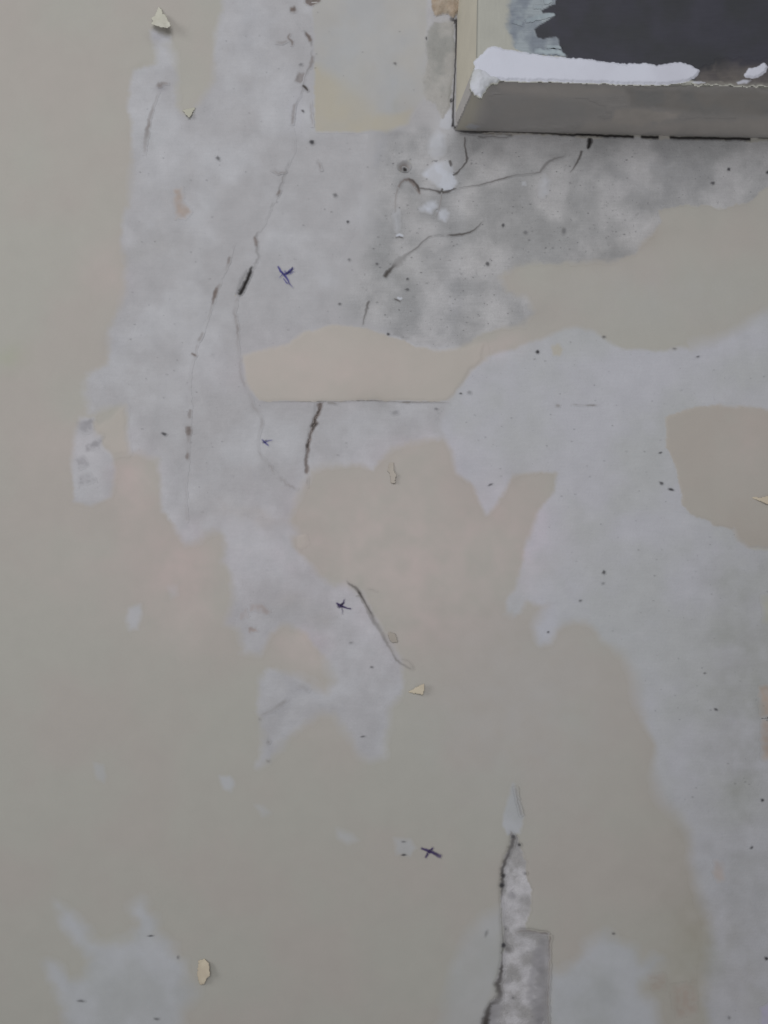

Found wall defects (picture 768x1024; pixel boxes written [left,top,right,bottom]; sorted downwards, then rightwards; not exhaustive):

crack [183,0,451,523]
crack [345,579,415,671]
peeling [79,0,768,772]
crack [382,16,768,279]
peeling [438,305,768,1024]
peeling [197,959,210,985]